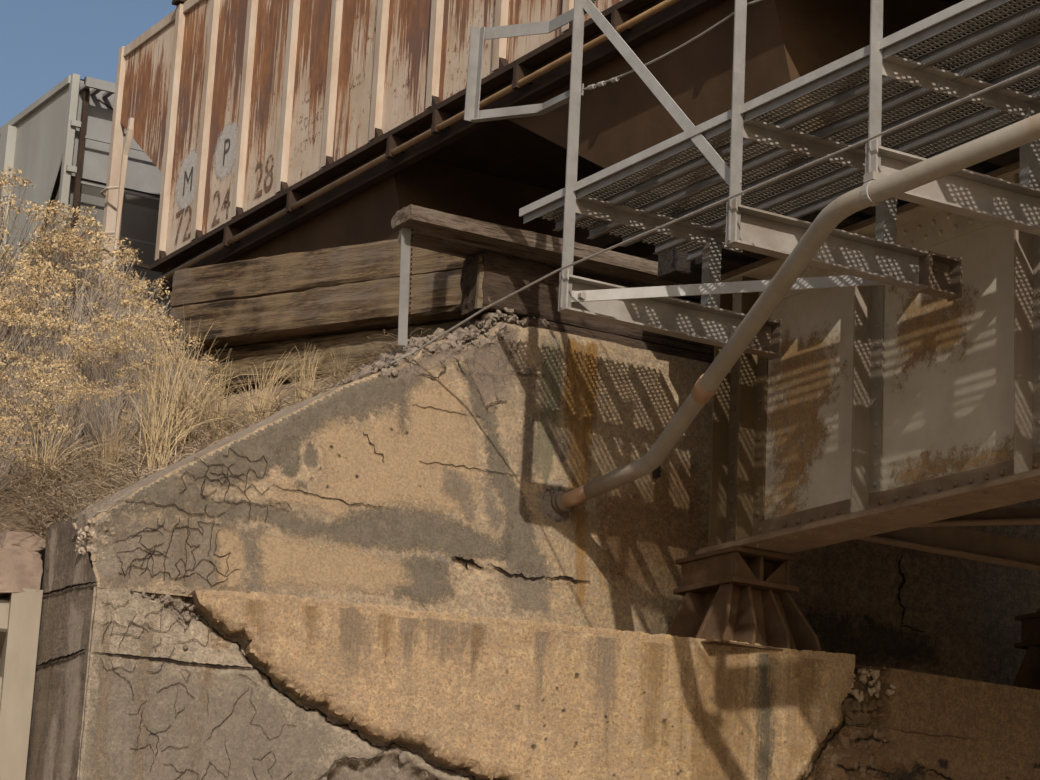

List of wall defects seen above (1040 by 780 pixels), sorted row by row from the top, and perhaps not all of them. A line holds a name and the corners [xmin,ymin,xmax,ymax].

rust [896,290,978,373]
rust [565,340,597,490]
rust [764,331,846,518]
leakage [456,366,569,612]
crack [36,448,385,780]
leakage [394,554,455,607]
leakage [400,617,484,661]
crack [451,556,590,583]
crack [898,554,925,632]
crack [316,746,438,780]
peeling [823,666,896,780]
crack [830,728,975,775]